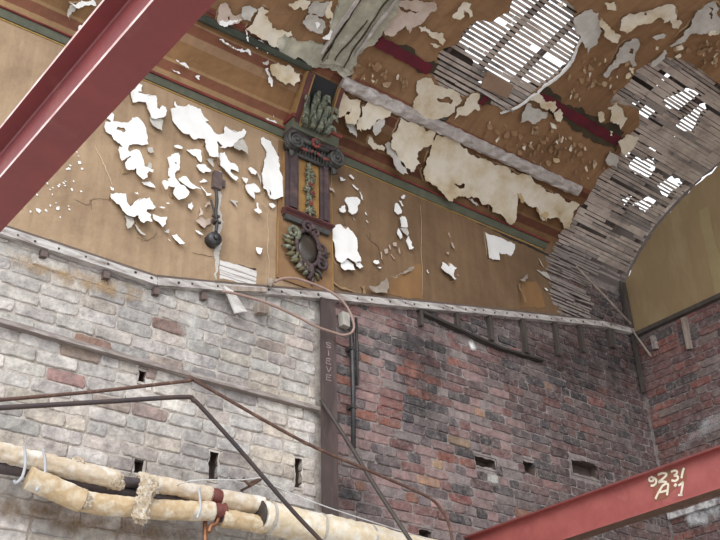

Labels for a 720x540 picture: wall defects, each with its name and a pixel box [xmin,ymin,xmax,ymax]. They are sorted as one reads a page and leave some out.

peeling [215,2,301,87]
peeling [289,0,334,40]
peeling [452,1,473,20]
peeling [484,0,720,180]
peeling [104,84,283,244]
peeling [337,55,580,229]
flaking render [214,243,222,279]
peeling [333,224,363,270]
peeling [373,195,414,268]
flaking render [386,263,429,300]
peeling [441,233,459,283]
peeling [484,232,515,261]